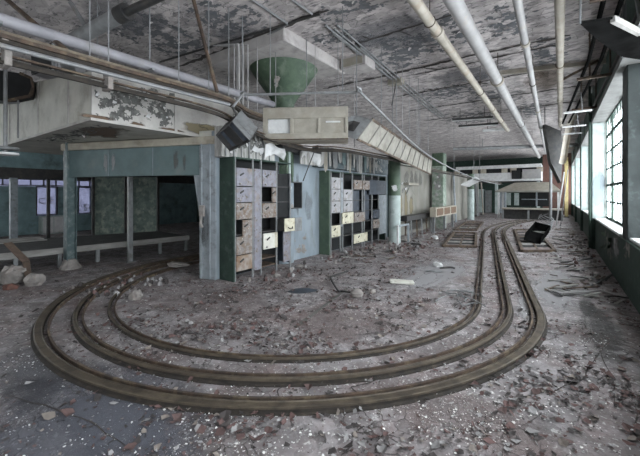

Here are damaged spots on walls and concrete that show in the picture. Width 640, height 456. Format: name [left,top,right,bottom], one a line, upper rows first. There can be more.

peeling [311,0,384,53]
peeling [368,28,444,72]
crack [323,35,570,89]
peeling [438,13,467,50]
peeling [471,5,519,44]
peeling [531,37,556,66]
peeling [94,80,174,129]
peeling [411,83,501,125]
peeling [509,91,549,119]